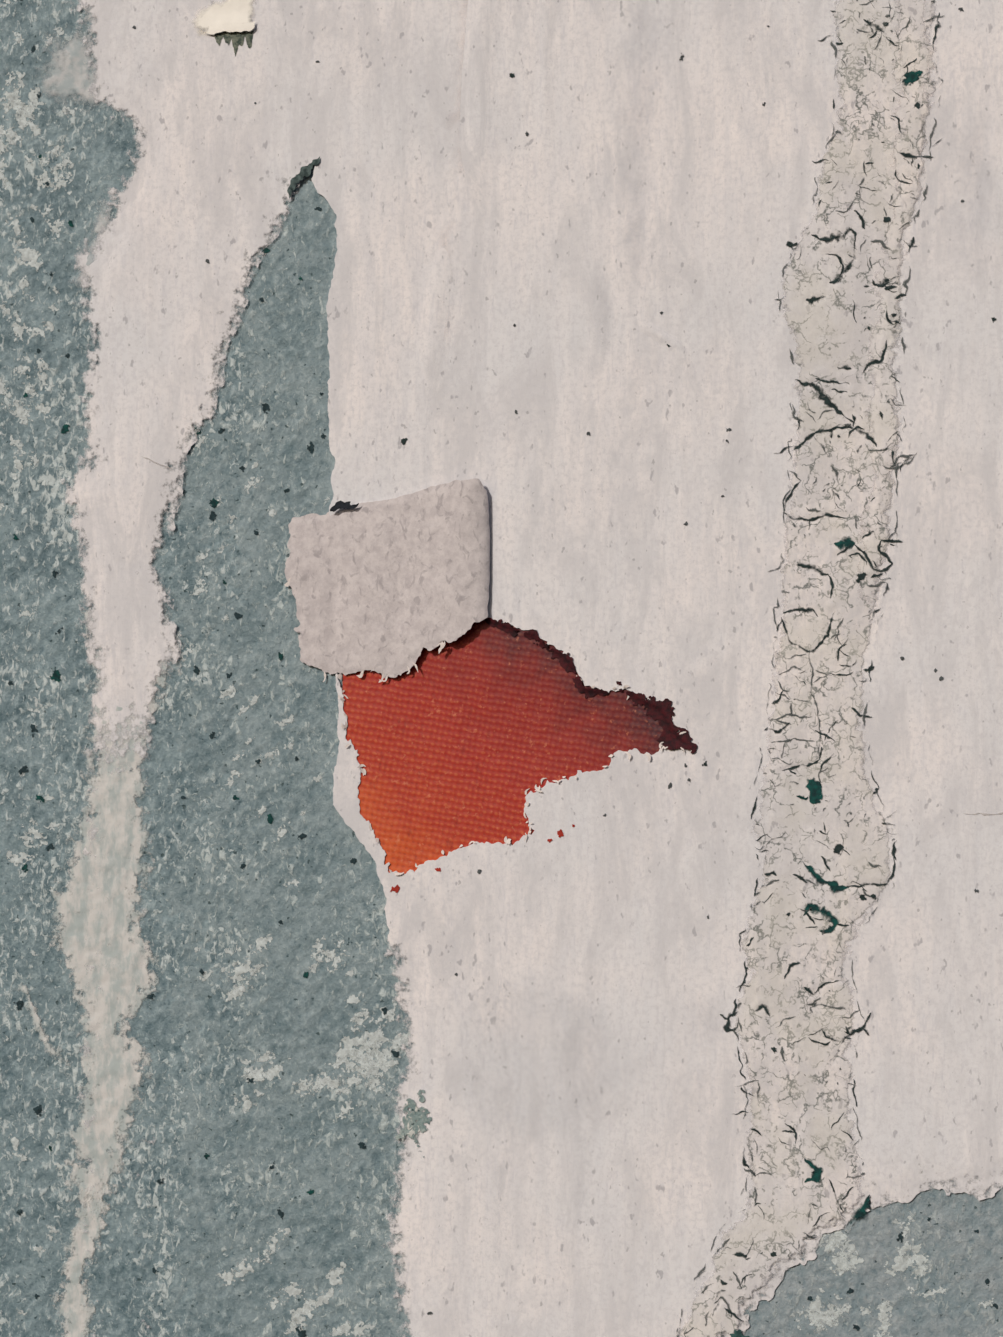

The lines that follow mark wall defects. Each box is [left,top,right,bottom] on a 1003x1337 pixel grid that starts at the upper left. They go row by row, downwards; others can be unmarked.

peeling [12,27,64,53]
peeling [0,71,74,480]
crack [677,0,944,1337]
spalling [28,696,43,737]
peeling [86,165,414,1337]
peeling [0,819,60,872]
peeling [8,1134,27,1161]
peeling [33,1225,61,1252]
peeling [723,1176,1003,1337]